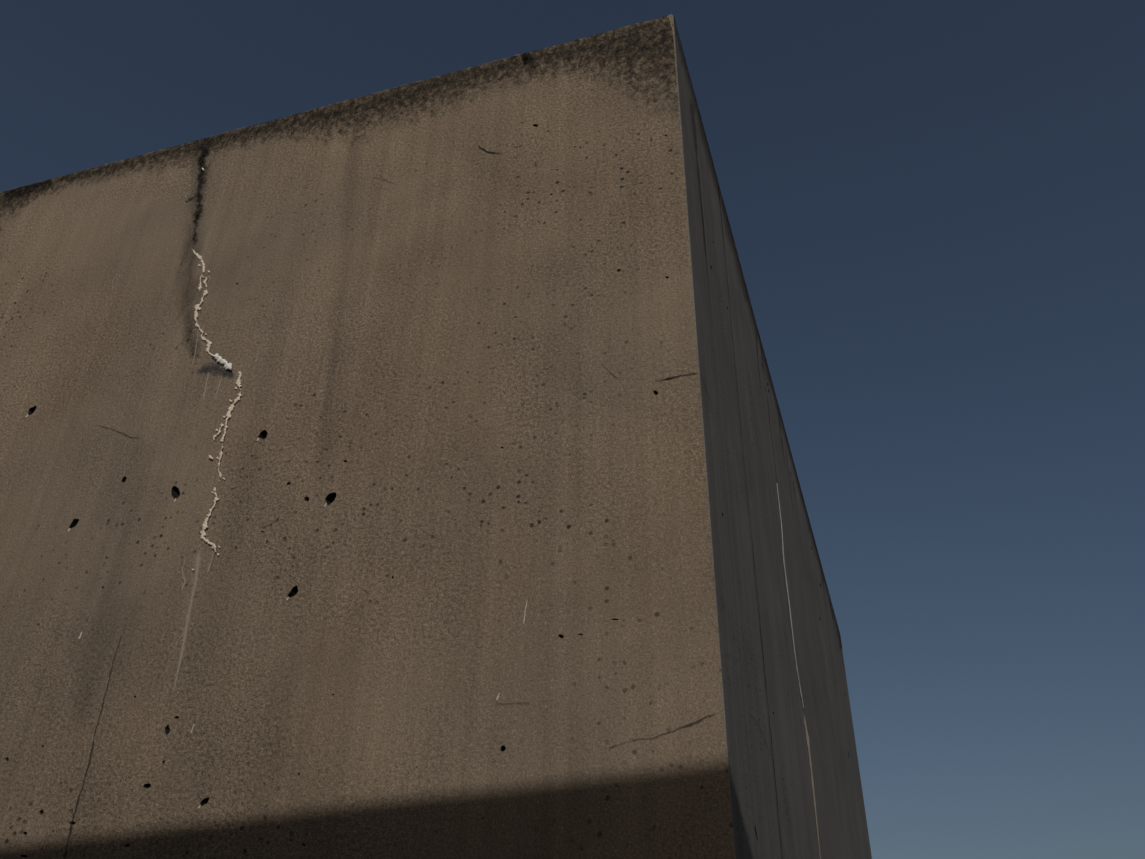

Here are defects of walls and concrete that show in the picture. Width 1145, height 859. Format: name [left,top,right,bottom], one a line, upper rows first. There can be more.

water stain [175,555,213,686]
crack [192,249,242,556]
crack [655,178,821,859]